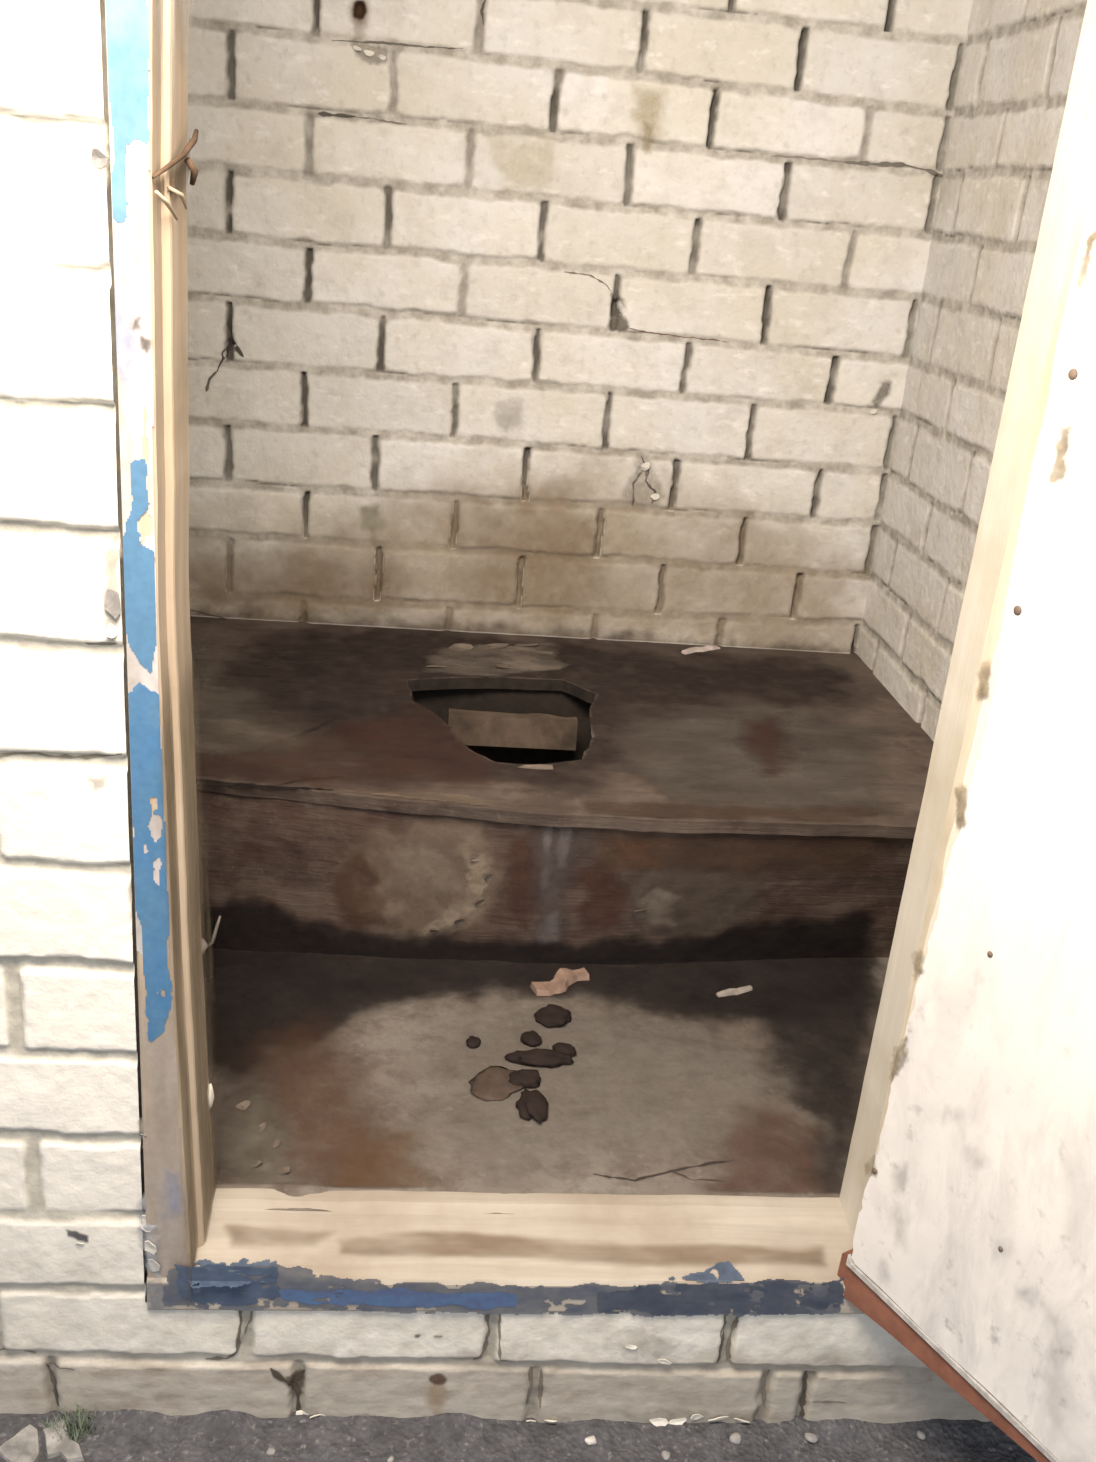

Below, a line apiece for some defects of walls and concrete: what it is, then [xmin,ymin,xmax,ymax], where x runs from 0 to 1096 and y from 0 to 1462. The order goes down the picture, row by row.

corrosion [353,1,366,19]
spalling [91,124,109,186]
spalling [104,538,121,640]
water stain [189,565,228,613]
water stain [283,494,826,650]
water stain [201,826,875,1192]
spalling [68,1231,88,1245]
peeling [139,1197,160,1274]